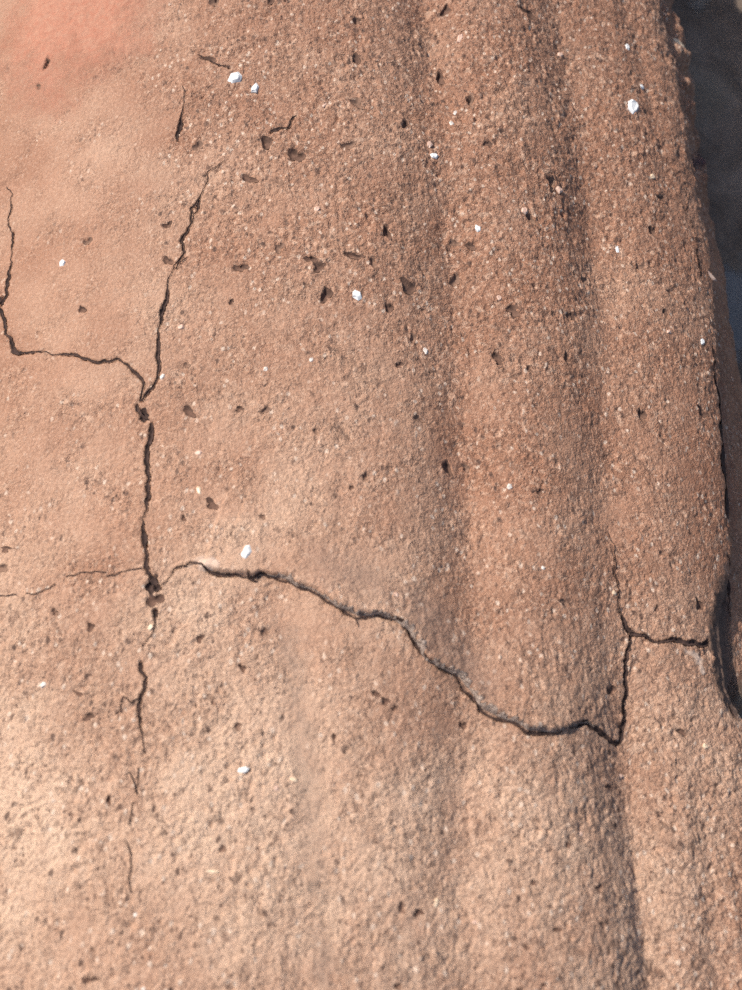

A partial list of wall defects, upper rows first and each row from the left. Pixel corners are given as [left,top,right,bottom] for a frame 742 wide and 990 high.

crack [175,86,185,141]
crack [270,115,296,133]
crack [712,347,729,519]
crack [0,161,708,892]
crack [725,554,733,617]